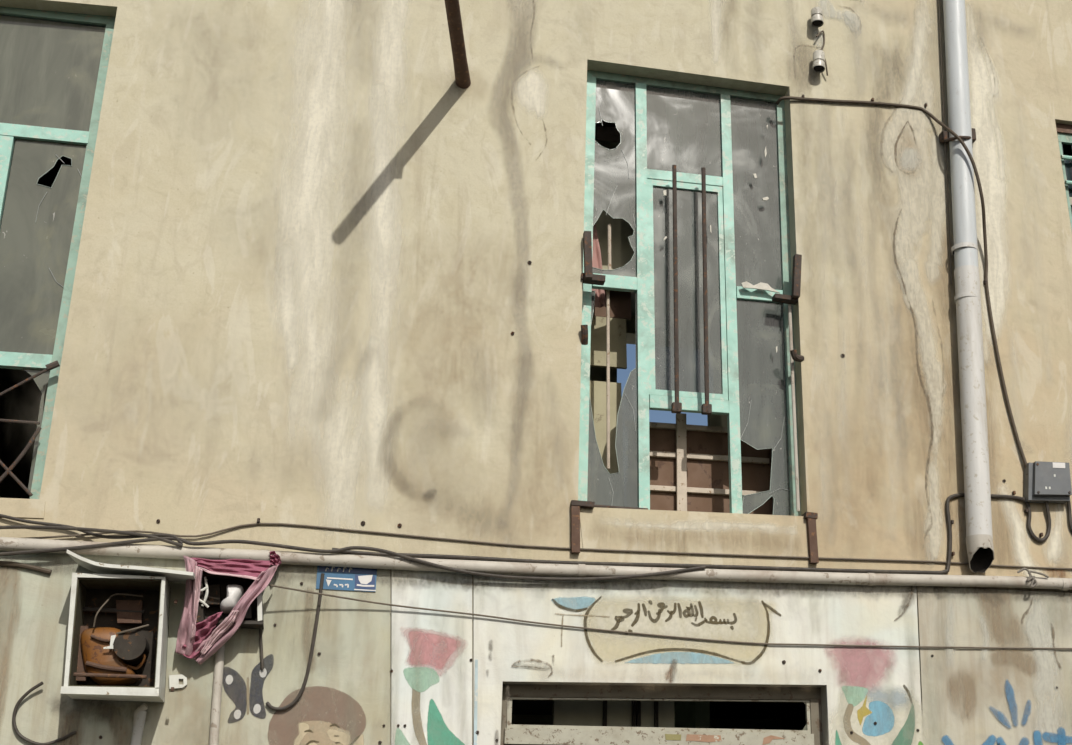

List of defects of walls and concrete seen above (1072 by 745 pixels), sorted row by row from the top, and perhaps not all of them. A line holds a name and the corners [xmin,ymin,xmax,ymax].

crack [511,8,546,155]